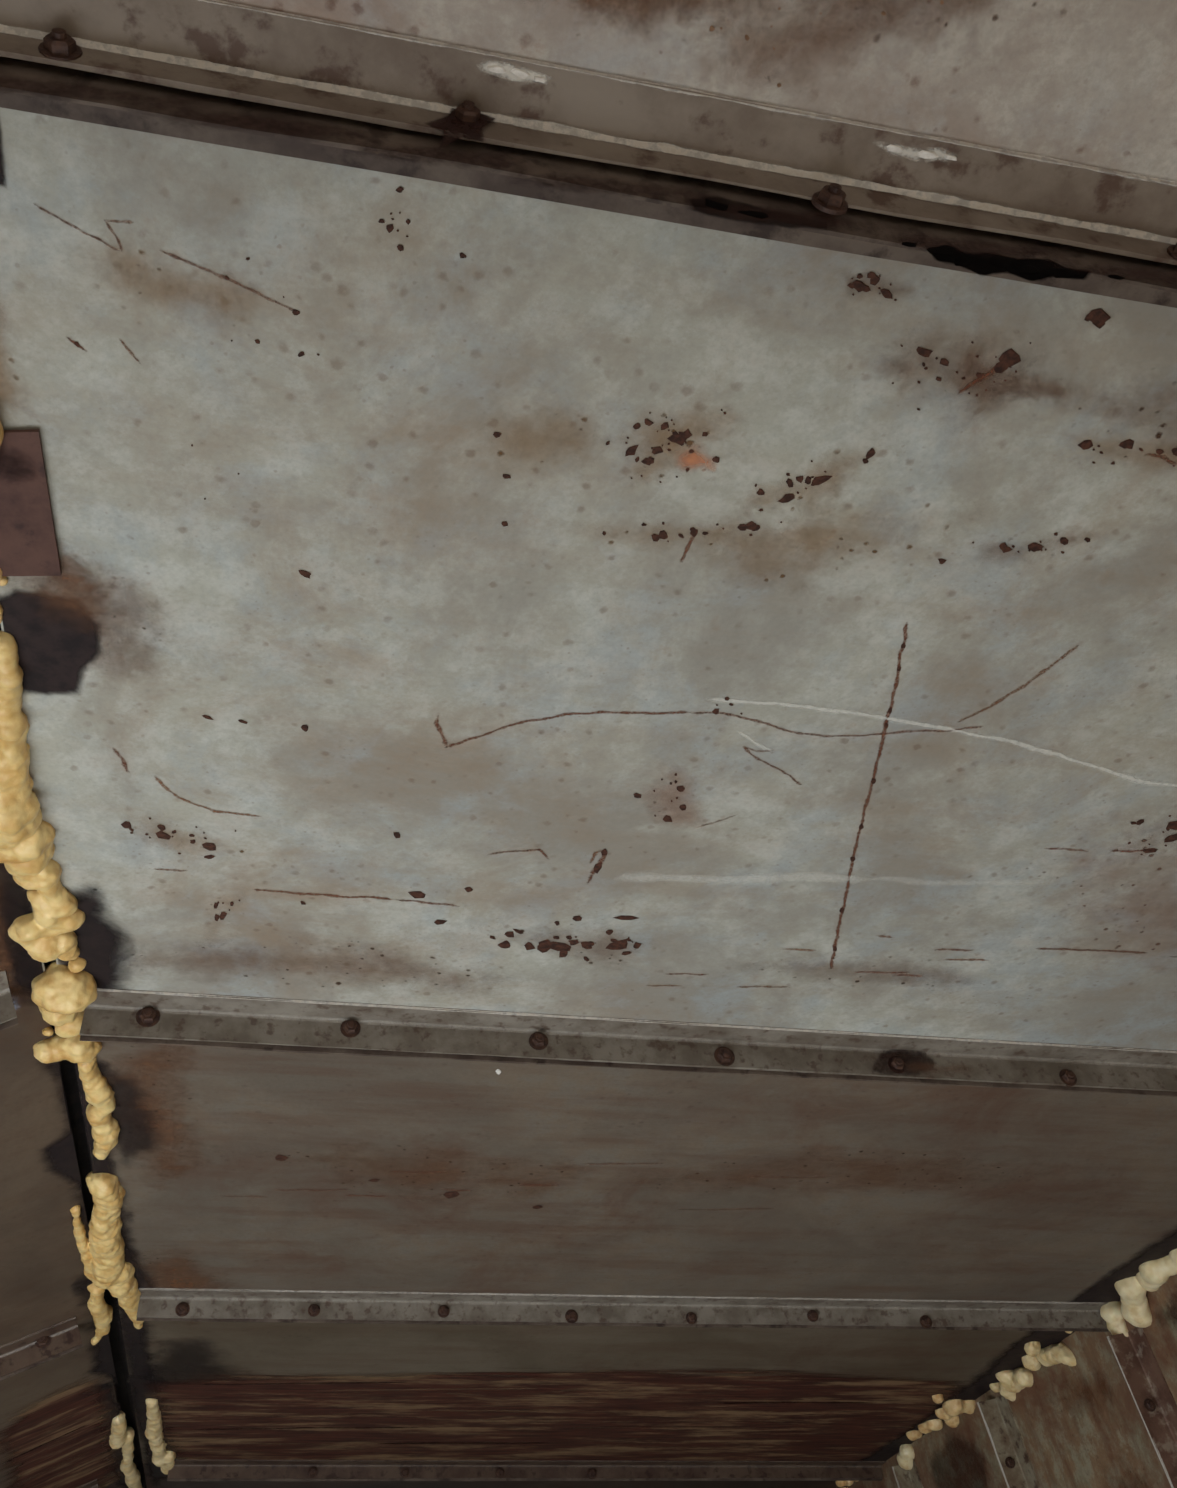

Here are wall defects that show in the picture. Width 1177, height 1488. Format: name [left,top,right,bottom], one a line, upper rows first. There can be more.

corrosion [0,77,876,229]
corrosion [896,235,1047,260]
corrosion [900,341,1031,397]
corrosion [606,412,720,483]
corrosion [1078,407,1177,467]
corrosion [0,863,39,994]
corrosion [490,916,642,964]